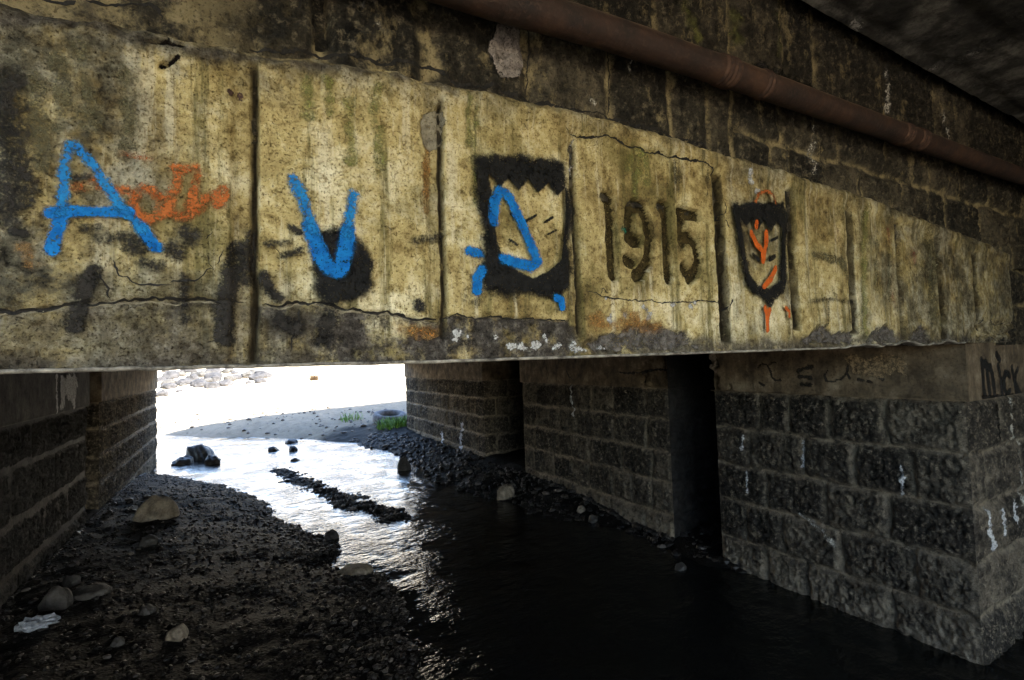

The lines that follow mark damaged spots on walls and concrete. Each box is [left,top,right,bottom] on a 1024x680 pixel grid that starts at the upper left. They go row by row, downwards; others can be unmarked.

peeling [488,23,523,78]
damp [300,74,359,166]
damp [370,82,386,174]
spalling [420,111,445,152]
crack [249,31,729,227]
crack [0,233,567,350]
damp [493,333,605,353]
rust [588,310,662,333]
damp [981,393,1024,551]